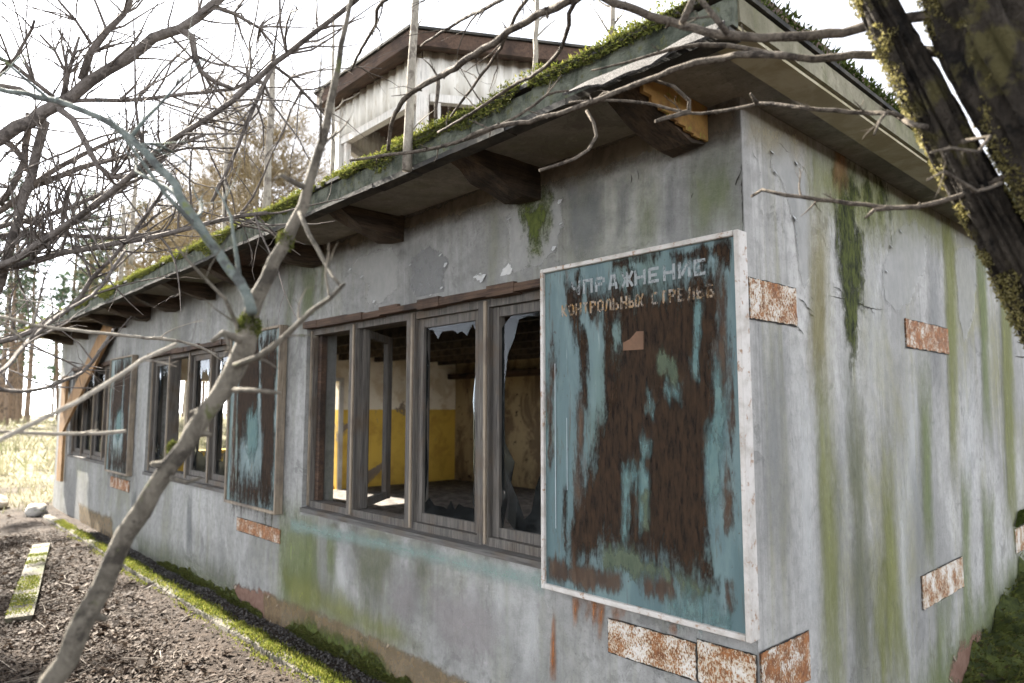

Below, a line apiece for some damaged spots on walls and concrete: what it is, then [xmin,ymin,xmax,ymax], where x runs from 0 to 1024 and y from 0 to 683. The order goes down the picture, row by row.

damp [962,493,970,621]
damp [984,515,992,593]